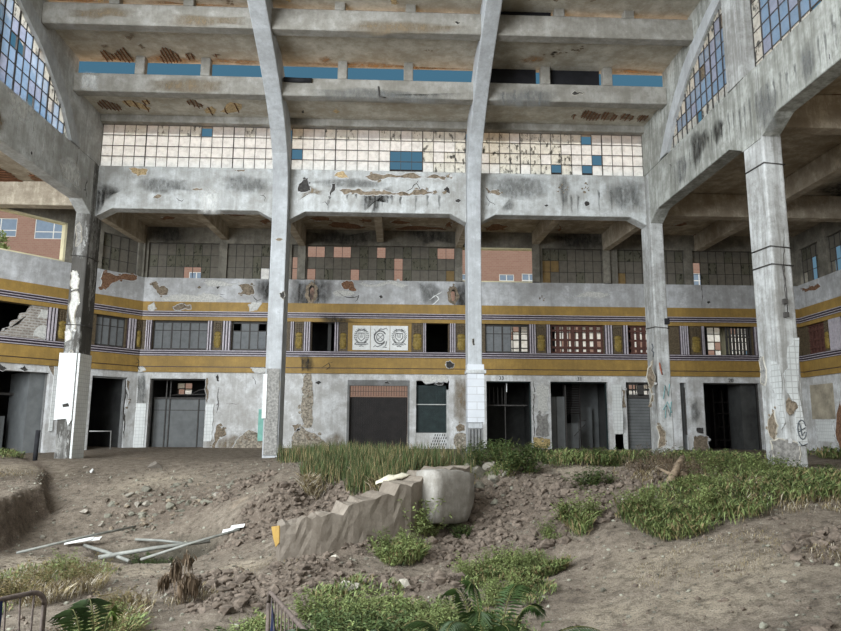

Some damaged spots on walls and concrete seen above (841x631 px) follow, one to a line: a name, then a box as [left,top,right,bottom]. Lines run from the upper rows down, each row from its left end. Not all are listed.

spalling [100,33,145,63]
spalling [159,48,195,64]
spalling [571,110,649,122]
damp [678,81,776,181]
peeling [329,171,462,203]
peeling [98,270,138,291]
peeling [64,270,80,353]
flaking render [287,373,328,448]
peeling [786,397,798,415]
peeling [210,423,227,448]
flaking render [232,428,262,448]
peeling [762,406,802,467]